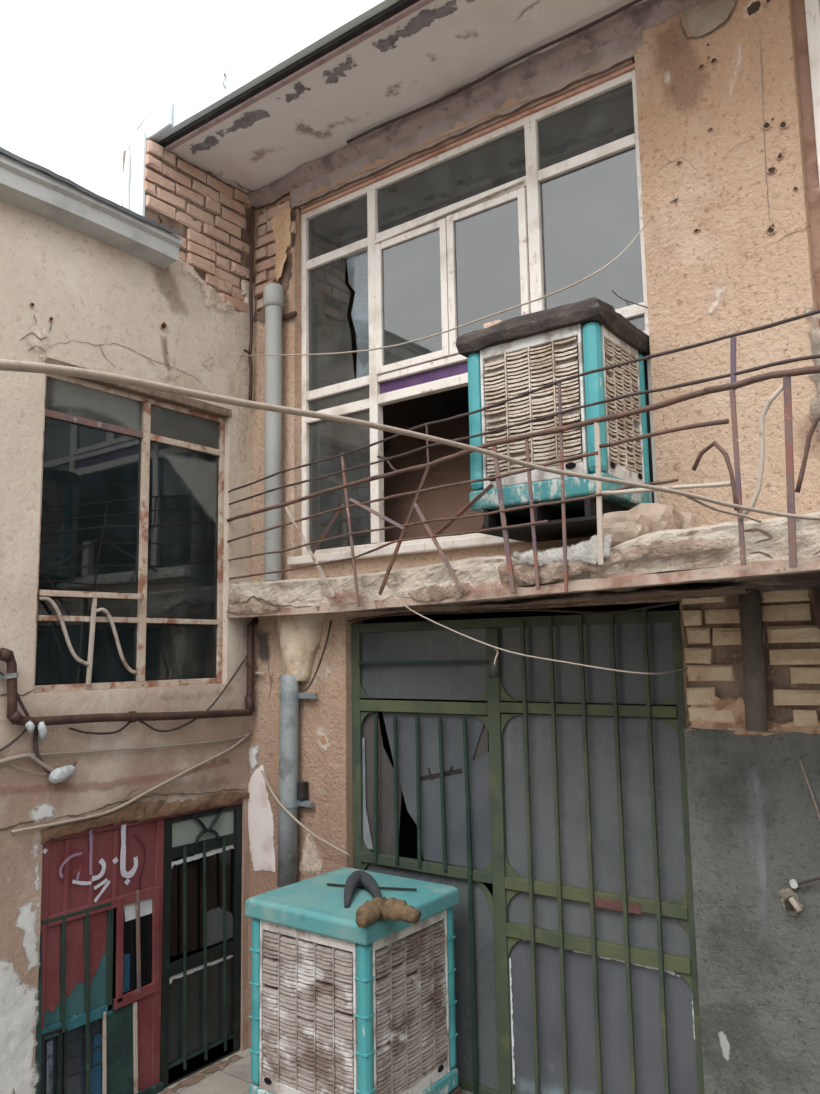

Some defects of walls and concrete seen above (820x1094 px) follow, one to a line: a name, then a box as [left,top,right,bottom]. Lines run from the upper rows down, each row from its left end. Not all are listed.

peeling [372,0,474,52]
peeling [278,82,311,102]
peeling [323,55,357,84]
flaking render [144,110,297,324]
crack [20,314,204,385]
spalling [804,308,820,441]
spalling [498,538,733,584]
spalling [31,745,276,890]
peeling [0,902,106,1094]